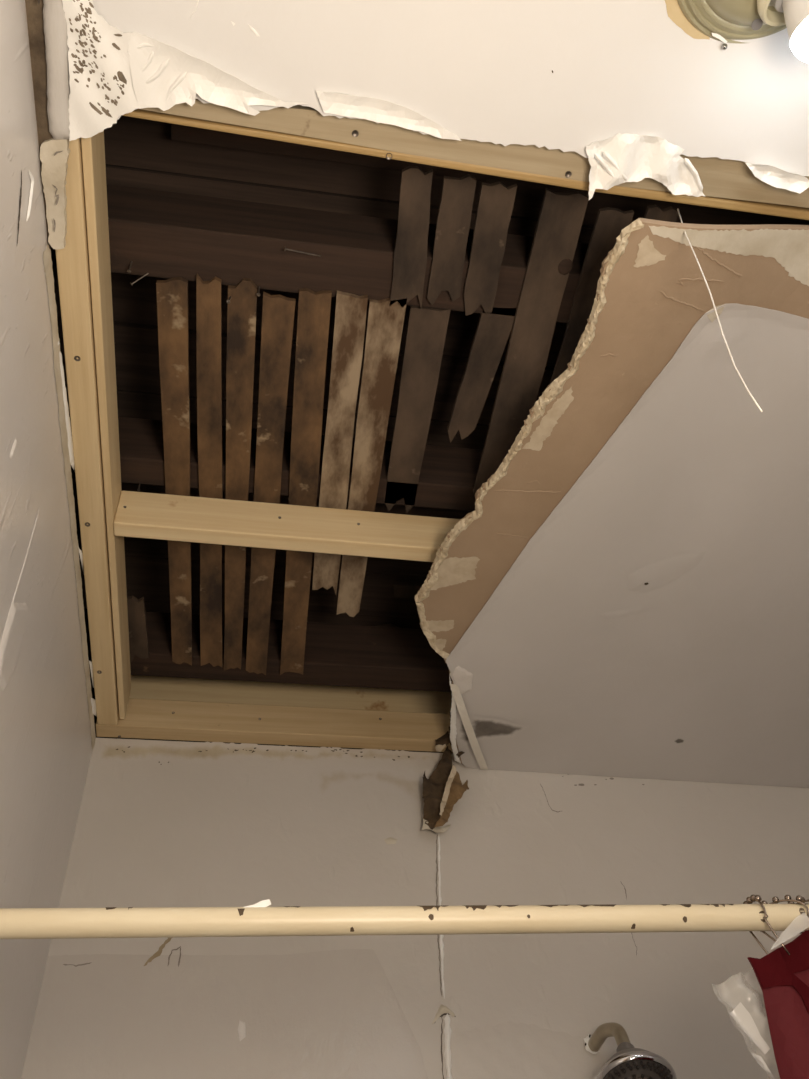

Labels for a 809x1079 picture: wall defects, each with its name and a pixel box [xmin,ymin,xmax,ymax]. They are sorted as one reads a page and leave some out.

peeling [586,133,706,200]
peeling [746,163,809,194]
peeling [58,341,75,472]
spalling [414,219,644,659]
peeling [449,676,461,764]
crack [435,834,443,905]
crack [432,935,456,1079]